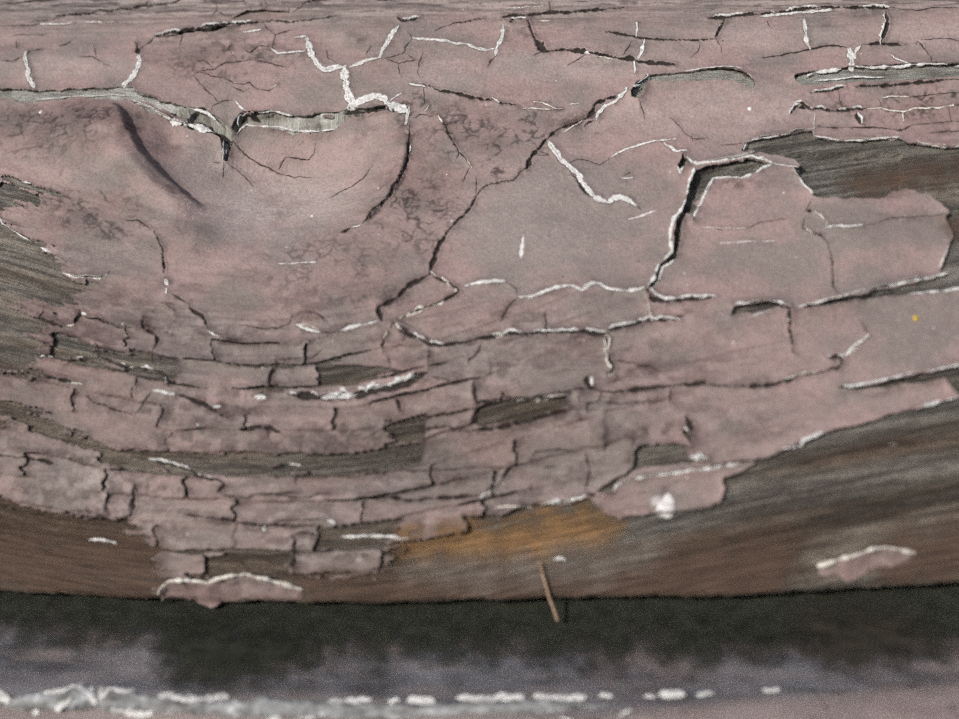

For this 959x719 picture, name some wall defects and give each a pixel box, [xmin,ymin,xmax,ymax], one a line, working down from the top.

crack [1,0,959,461]
peeling [0,117,959,608]
crack [0,455,54,465]
crack [55,484,138,521]
crack [149,458,414,571]
crack [355,449,610,518]